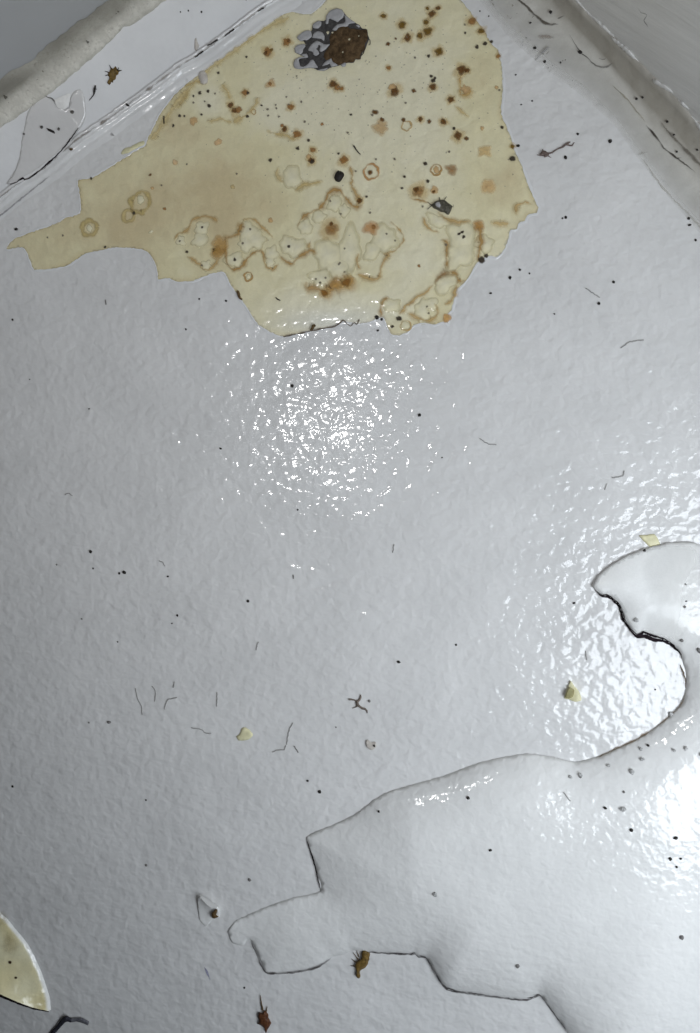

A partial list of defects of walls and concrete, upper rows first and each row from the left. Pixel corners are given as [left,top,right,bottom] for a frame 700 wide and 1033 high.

leakage [5,0,540,338]
peeling [0,913,51,1012]